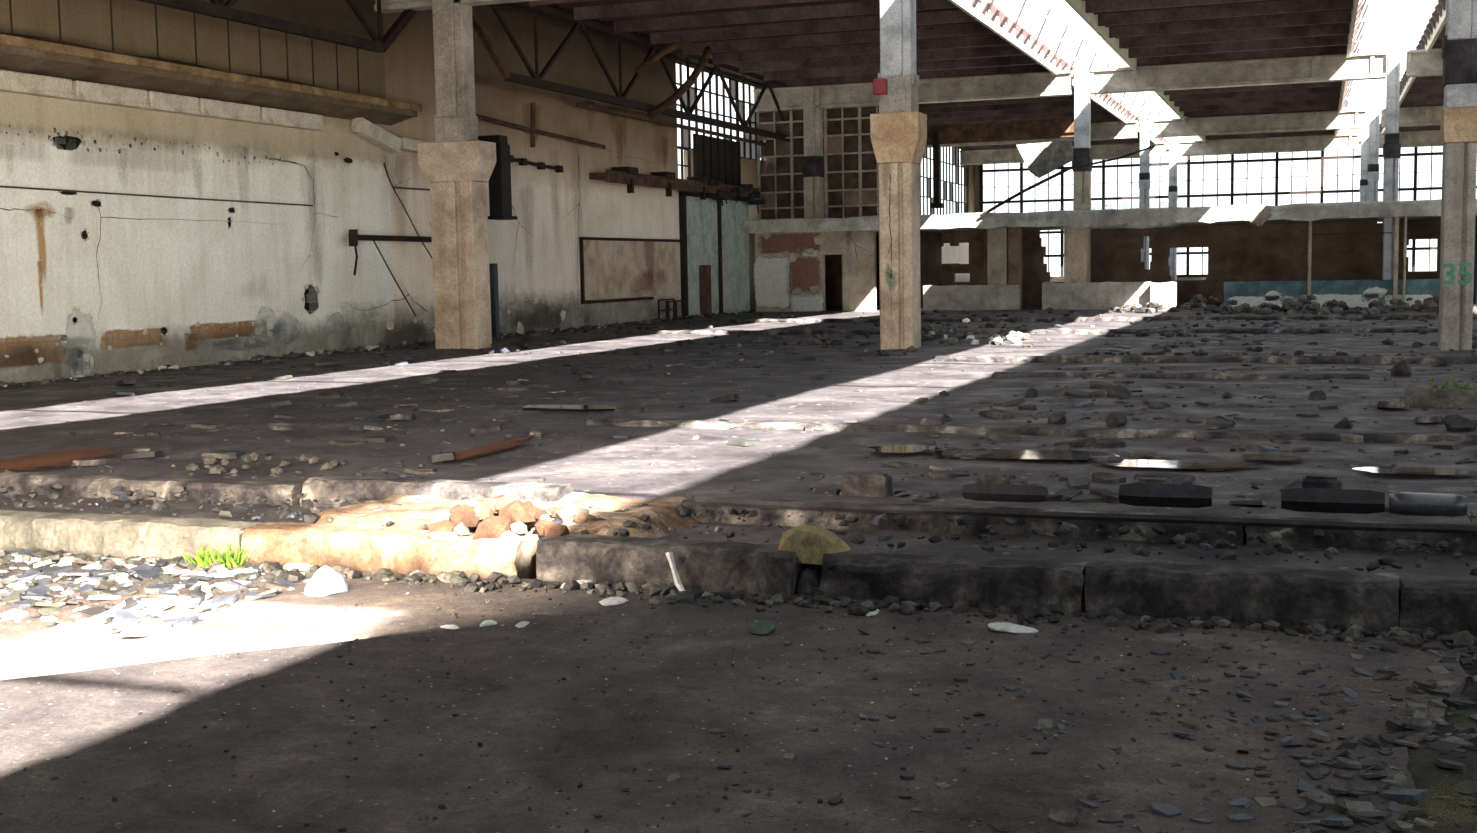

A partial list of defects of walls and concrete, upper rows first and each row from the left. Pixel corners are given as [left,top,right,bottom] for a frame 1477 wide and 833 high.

corrosion [31,207,50,307]
flaking render [754,233,825,312]
flaking render [0,284,343,378]